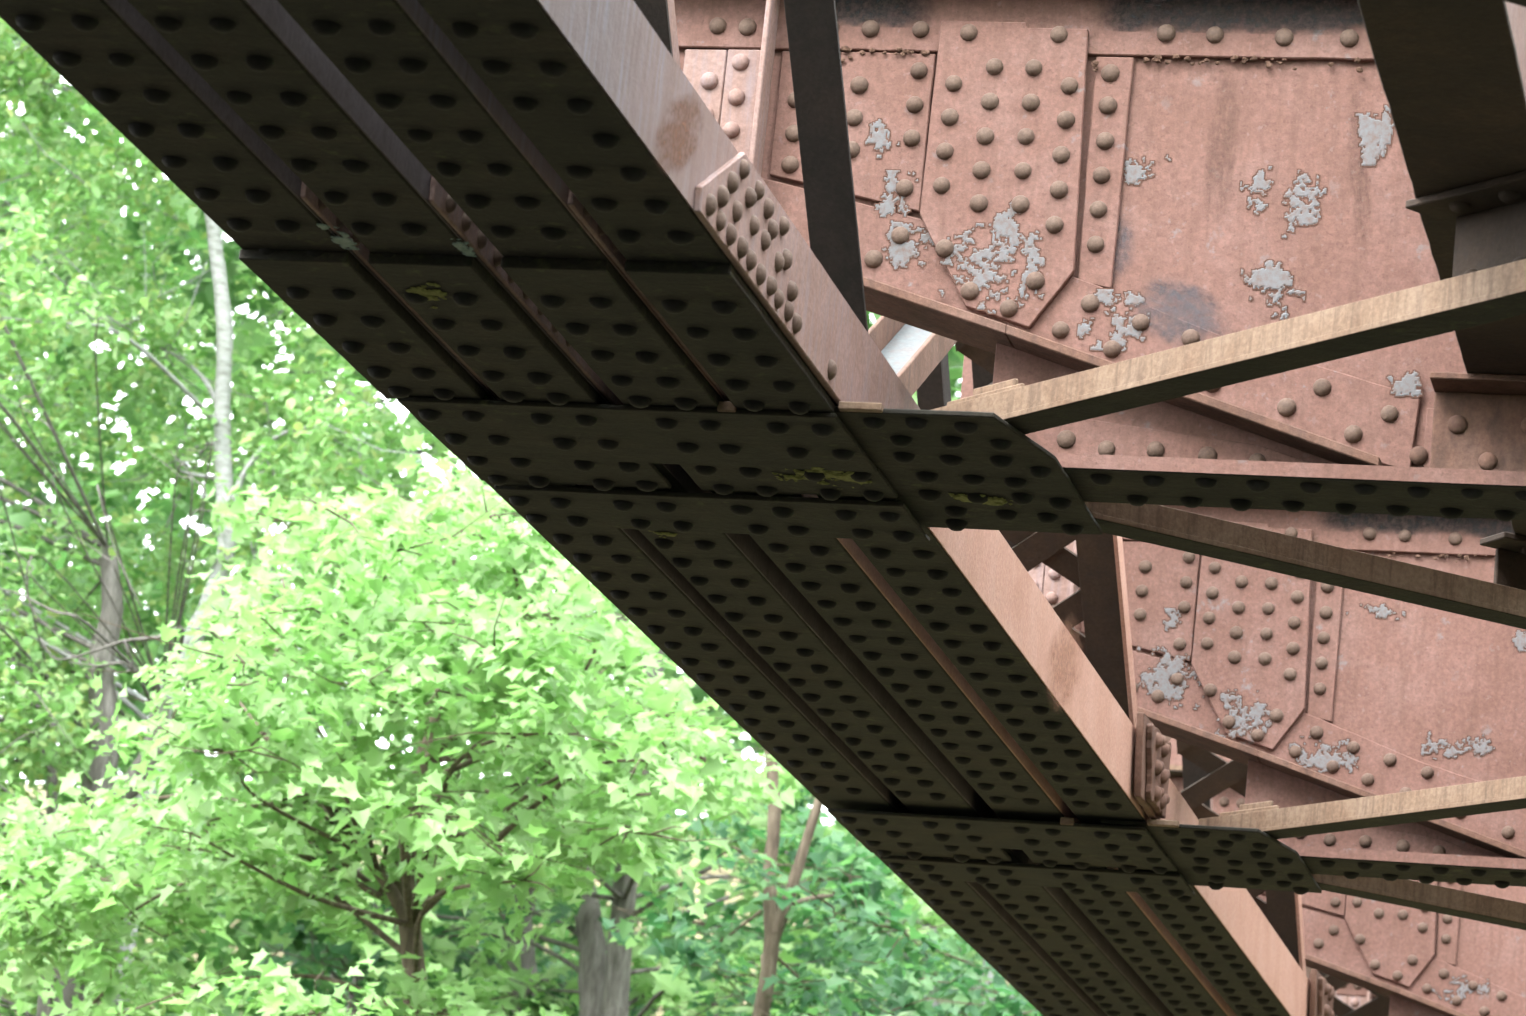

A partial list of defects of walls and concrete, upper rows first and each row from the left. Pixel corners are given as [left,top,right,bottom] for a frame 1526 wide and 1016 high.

peeling [1354,104,1395,167]
peeling [1123,154,1172,186]
peeling [864,118,1046,315]
peeling [1239,165,1328,239]
peeling [1076,288,1151,352]
peeling [1239,259,1307,321]
peeling [1136,607,1273,739]
peeling [1288,735,1360,774]
peeling [1420,730,1496,761]